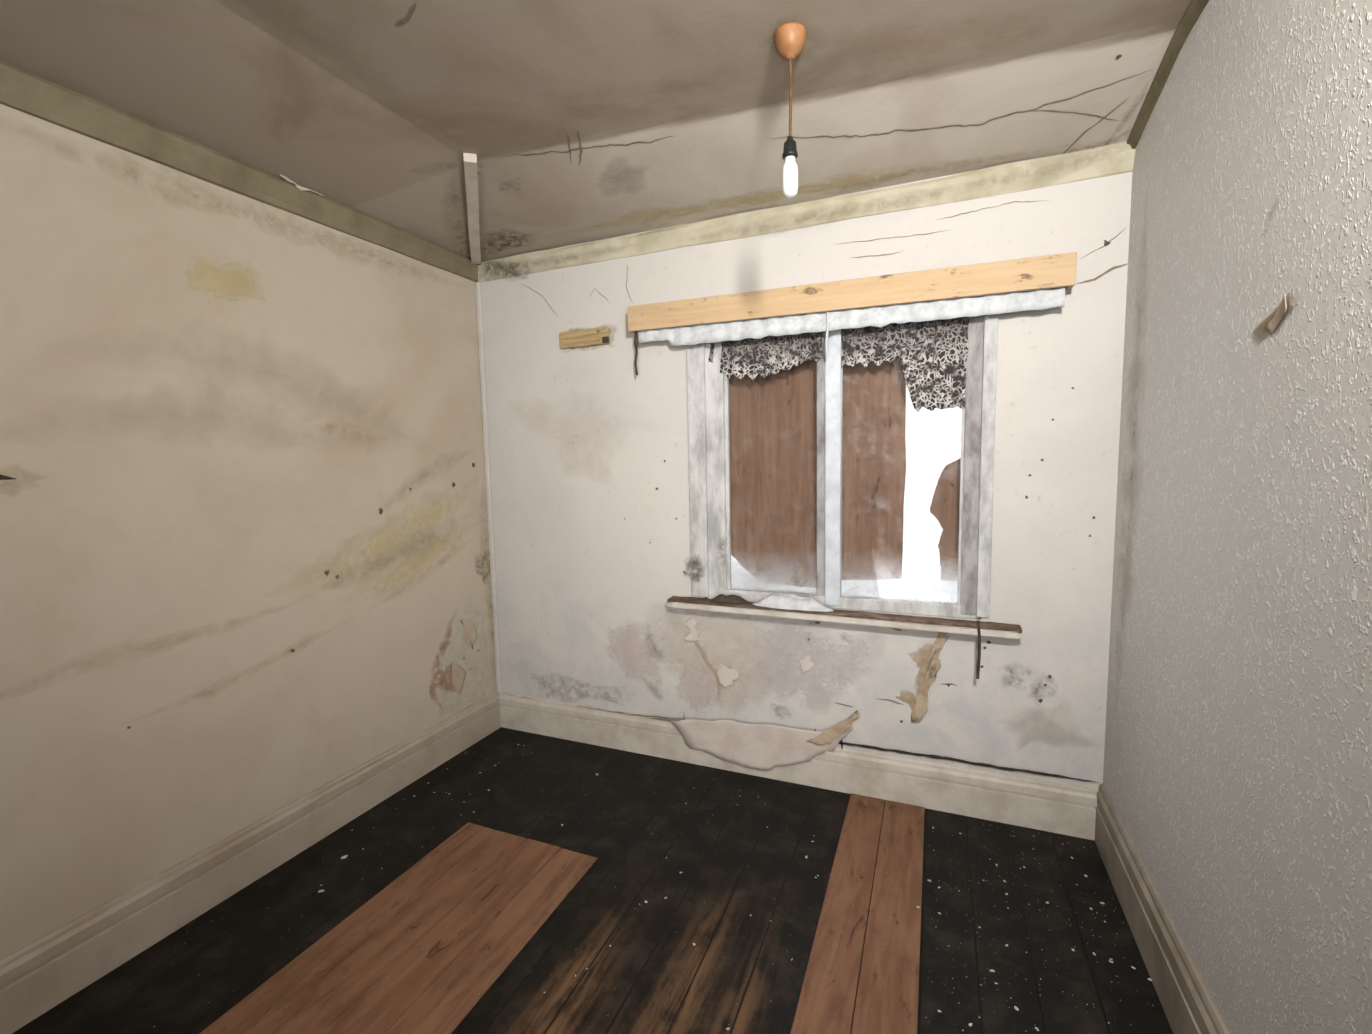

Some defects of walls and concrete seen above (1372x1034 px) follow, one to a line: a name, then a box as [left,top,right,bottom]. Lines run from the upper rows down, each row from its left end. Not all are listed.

crack [770,70,1149,139]
crack [503,130,672,166]
crack [839,200,1048,258]
crack [1076,230,1128,284]
peeling [1254,293,1292,342]
spalling [431,620,479,698]
peeling [911,640,946,692]